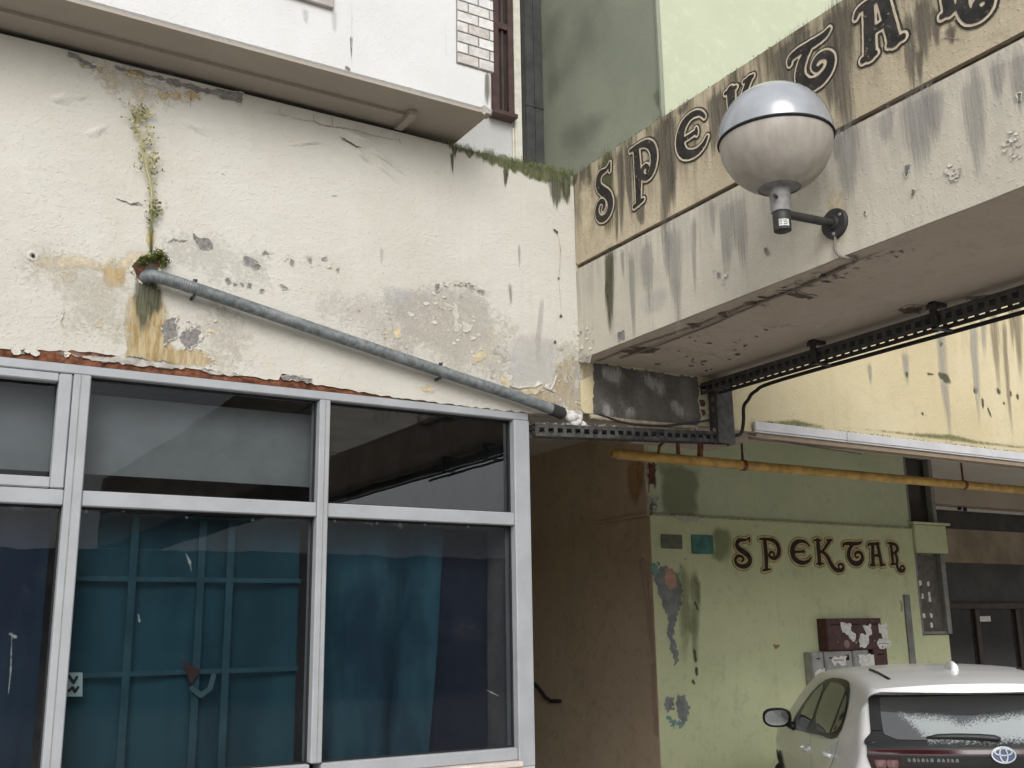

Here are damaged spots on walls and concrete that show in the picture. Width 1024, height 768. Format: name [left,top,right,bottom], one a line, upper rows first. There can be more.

damp [823,0,862,124]
damp [903,0,955,83]
damp [504,161,585,207]
damp [654,104,686,223]
peeling [193,233,213,250]
damp [136,281,161,327]
spalling [59,351,185,369]
peeling [161,315,241,377]
peeling [407,281,713,429]
damp [991,309,1021,404]
peeling [651,558,687,666]
peeling [664,694,691,729]